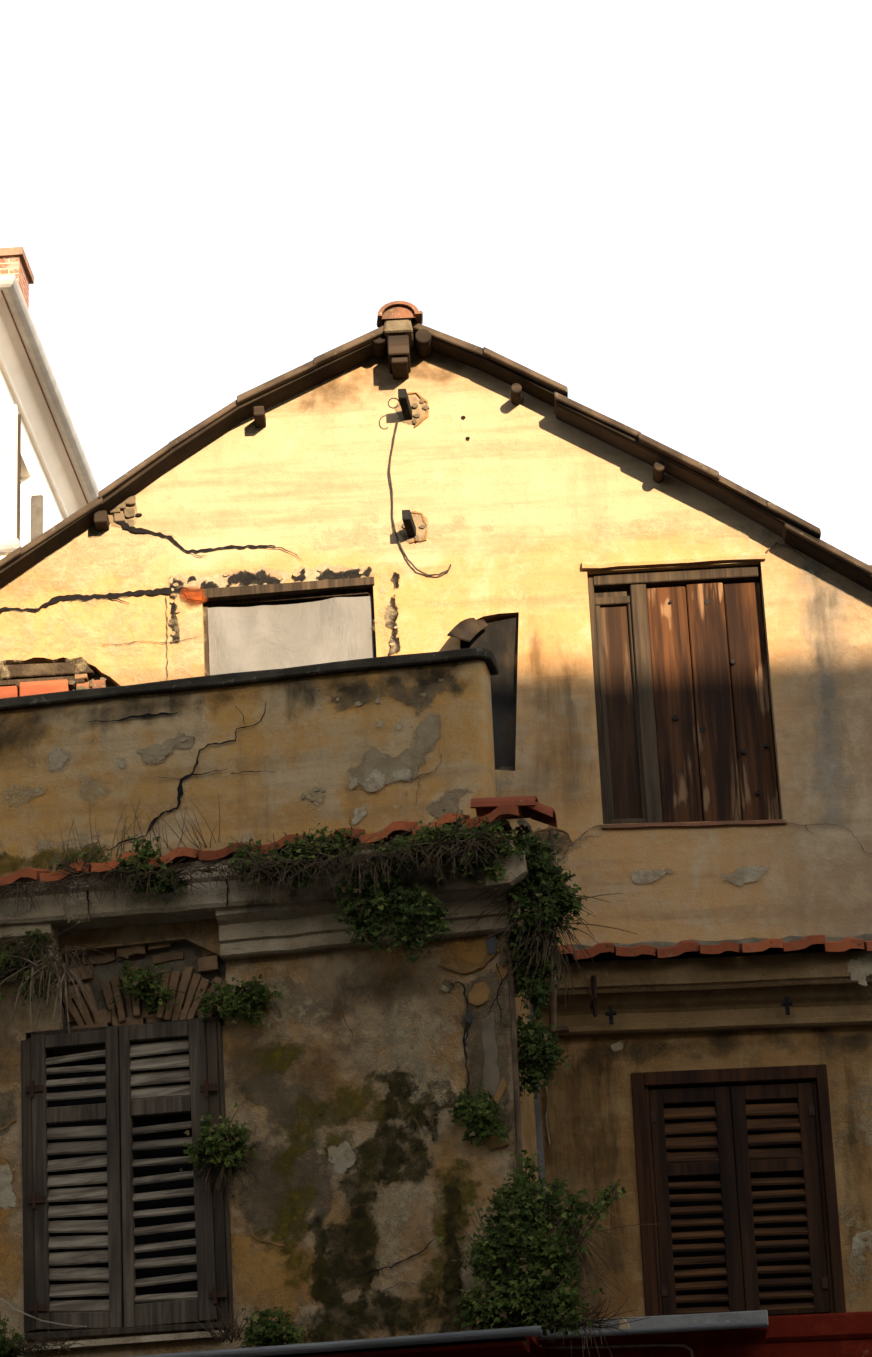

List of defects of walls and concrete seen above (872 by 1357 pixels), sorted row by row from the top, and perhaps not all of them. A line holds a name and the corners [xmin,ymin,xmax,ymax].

crack [113,514,300,559]
crack [0,587,198,679]
flaking render [167,563,374,644]
peeling [379,572,401,656]
crack [88,712,178,722]
crack [108,702,270,851]
flaking render [332,676,459,825]
peeling [328,1141,356,1175]
leakage [384,1077,427,1182]
leakage [309,1215,331,1302]
leakage [354,1195,376,1317]
leakage [444,1176,462,1293]